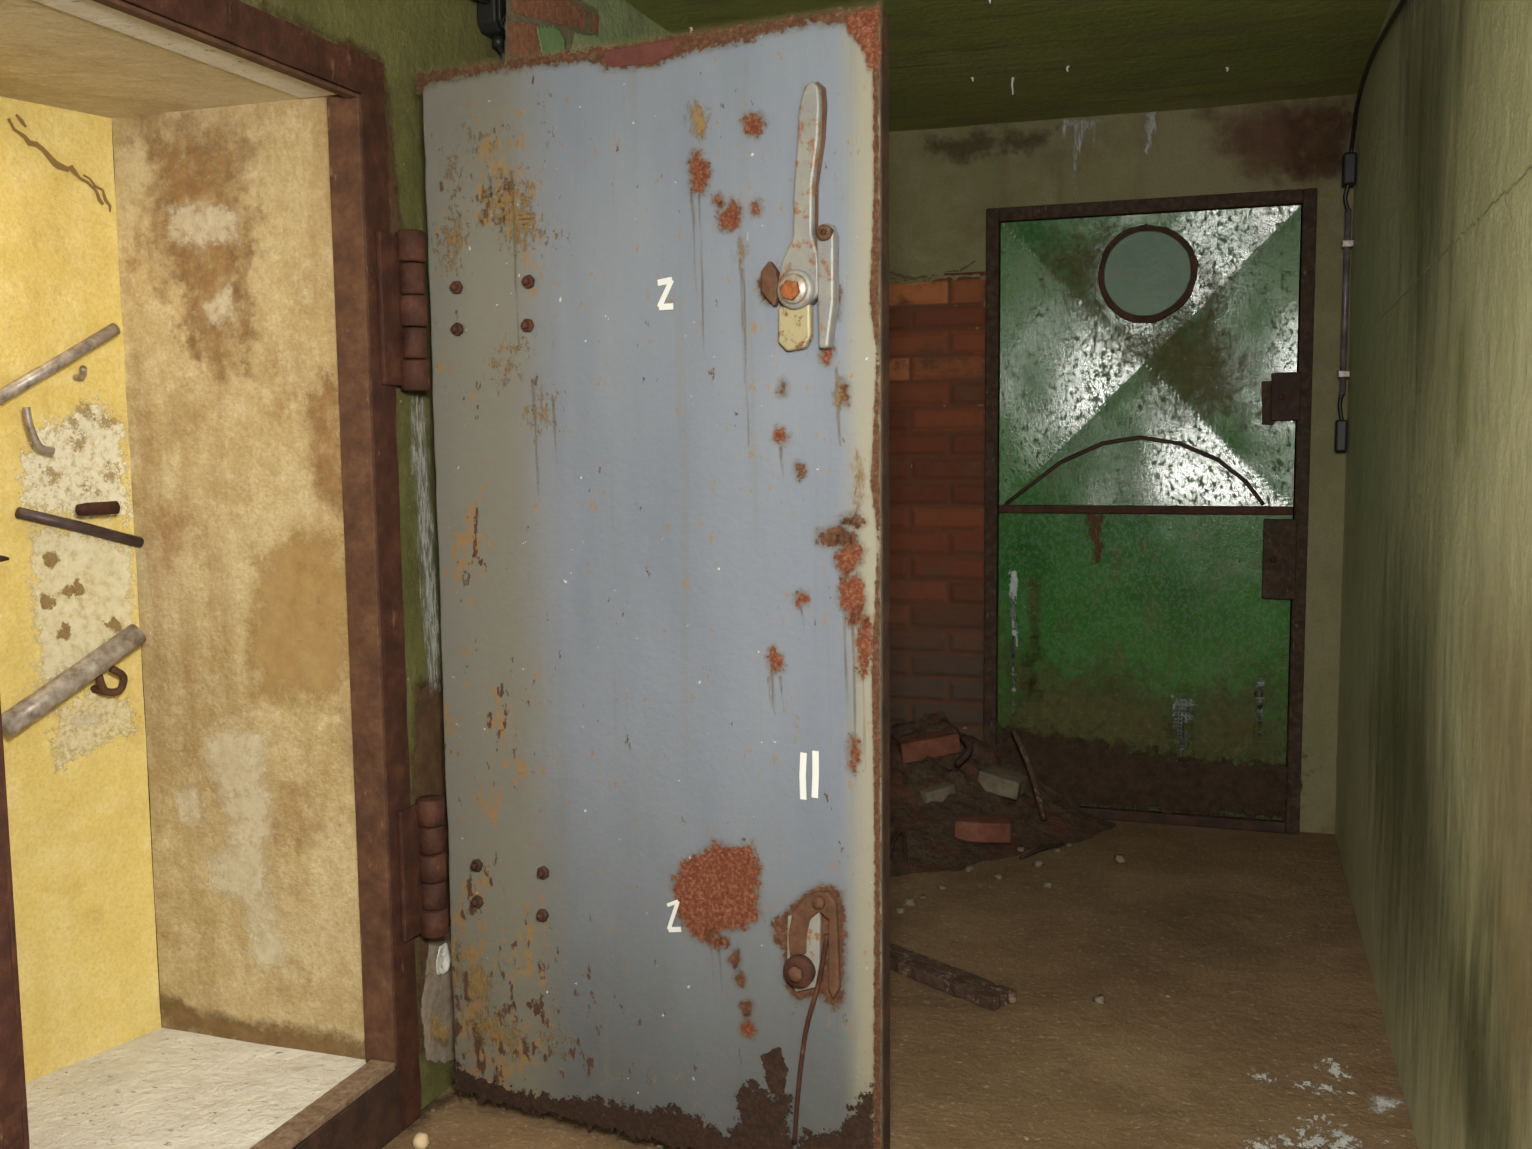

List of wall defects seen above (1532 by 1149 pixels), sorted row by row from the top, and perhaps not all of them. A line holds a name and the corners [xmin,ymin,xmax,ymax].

spalling [504,0,599,65]
crack [7,114,112,212]
peeling [14,391,136,689]
rust [412,3,882,1149]
peeling [46,690,141,774]